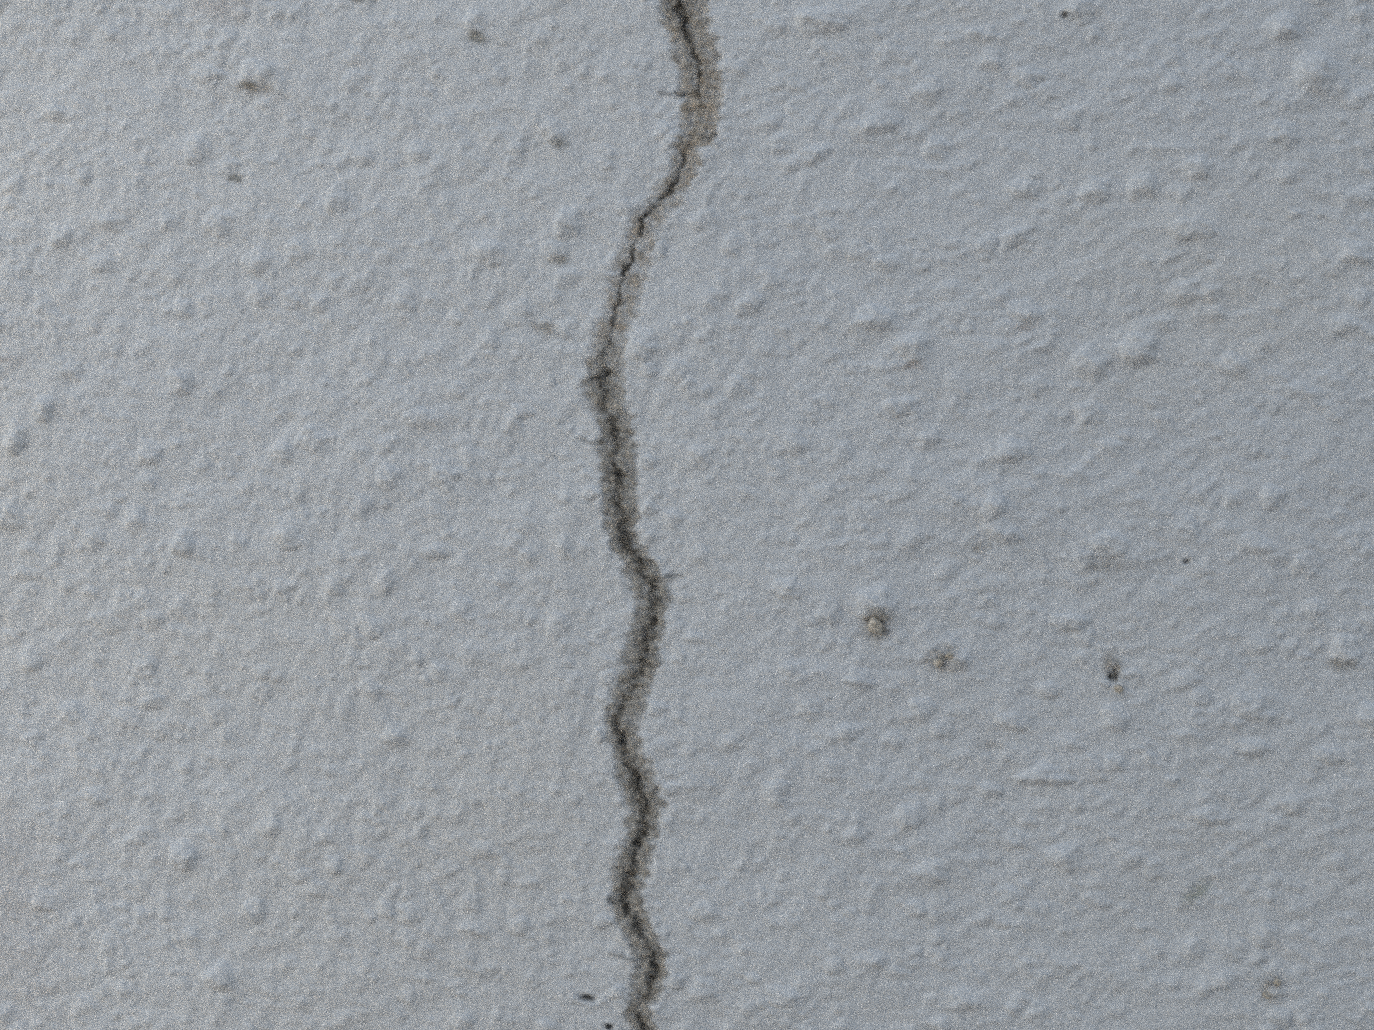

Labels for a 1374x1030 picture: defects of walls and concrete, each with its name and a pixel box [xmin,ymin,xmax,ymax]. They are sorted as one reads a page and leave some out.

crack [578,0,719,1030]